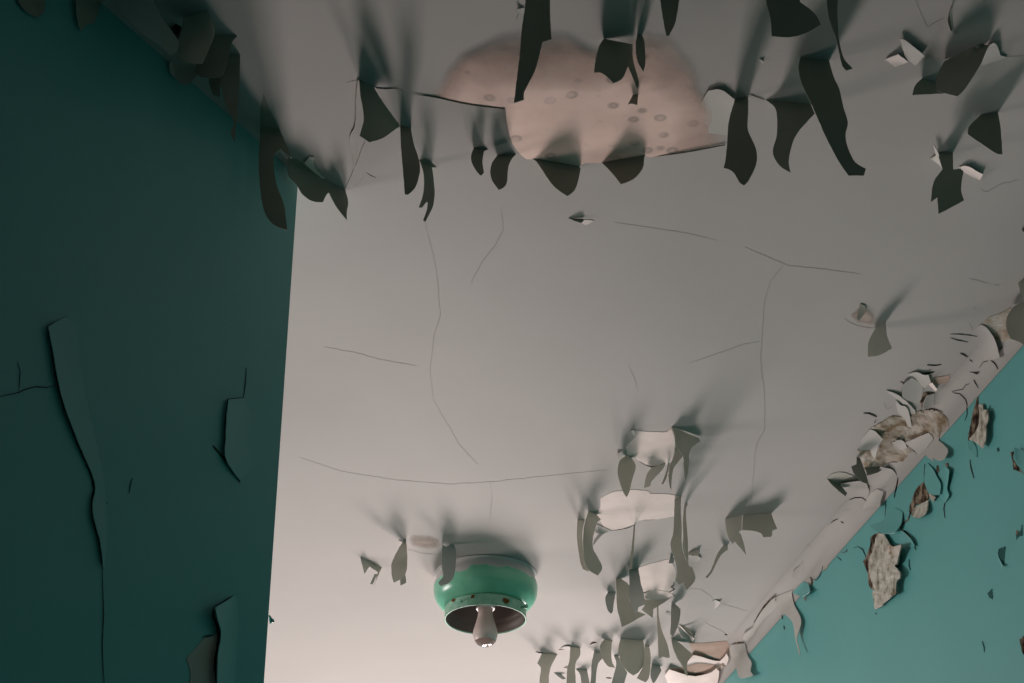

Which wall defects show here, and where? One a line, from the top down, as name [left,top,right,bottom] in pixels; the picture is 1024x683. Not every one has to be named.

peeling [886,38,925,67]
peeling [912,42,1024,96]
peeling [259,0,866,230]
peeling [968,113,1002,155]
peeling [930,144,1015,214]
peeling [971,281,1024,361]
crack [300,224,603,514]
crack [691,247,858,497]
spalling [968,397,1024,478]
peeling [827,365,950,614]
peeling [360,535,456,586]
peeling [537,427,804,683]